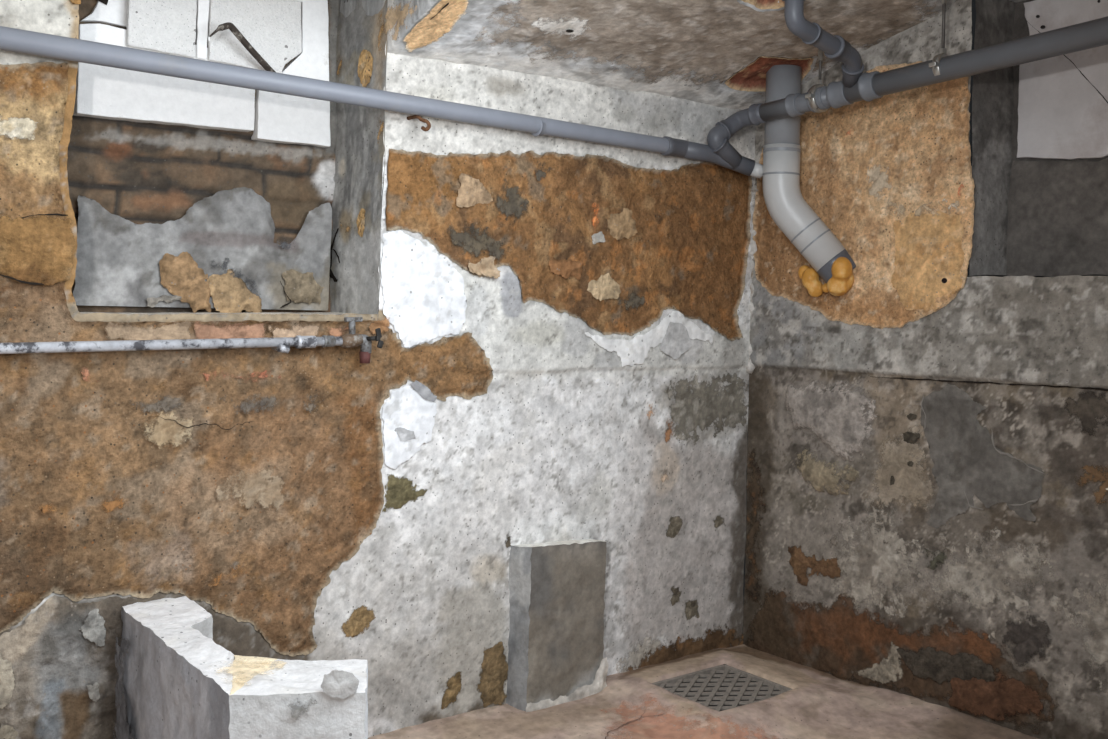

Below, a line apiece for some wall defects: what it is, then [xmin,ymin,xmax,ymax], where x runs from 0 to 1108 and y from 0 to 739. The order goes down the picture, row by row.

spalling [357,49,373,87]
spalling [382,0,469,52]
spalling [867,61,922,73]
spalling [0,77,975,739]
leakage [1064,391,1108,435]
leakage [744,450,766,602]
rust [745,587,1058,734]
leakage [831,498,1054,667]
leakage [1050,574,1108,693]